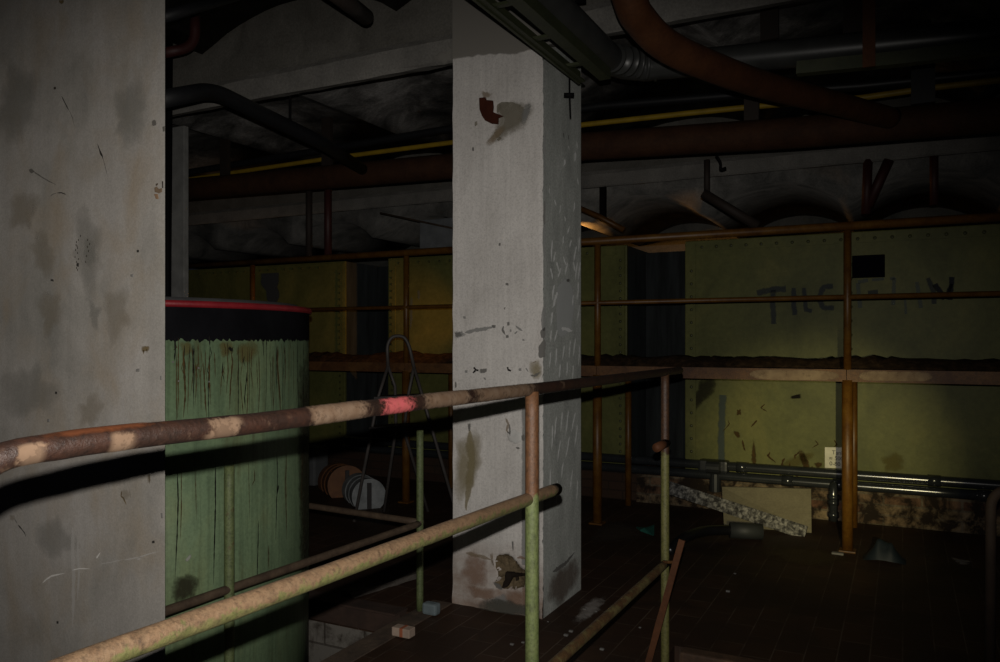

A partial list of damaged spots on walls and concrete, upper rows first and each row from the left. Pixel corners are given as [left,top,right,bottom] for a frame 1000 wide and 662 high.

spalling [490,102,530,141]
corrosion [176,338,260,419]
corrosion [285,426,309,572]
leakage [459,424,478,510]
spalling [491,508,525,605]